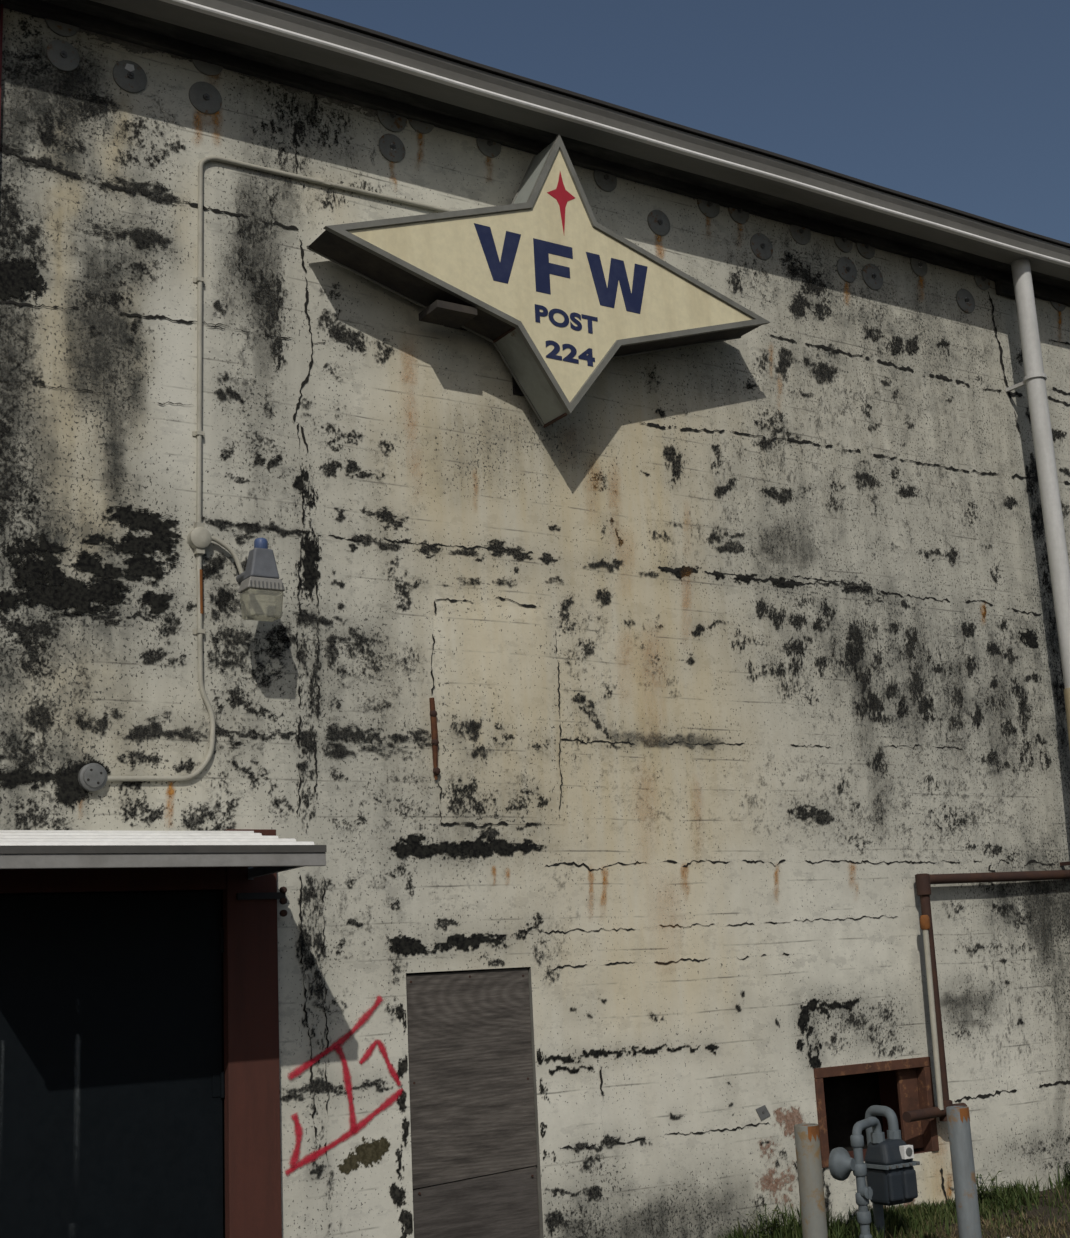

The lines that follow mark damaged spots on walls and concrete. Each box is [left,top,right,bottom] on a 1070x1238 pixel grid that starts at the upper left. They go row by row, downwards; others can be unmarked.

water stain [0,16,190,269]
water stain [235,88,352,373]
crack [0,106,533,827]
crack [642,292,1070,492]
corrosion [429,697,441,780]
crack [658,566,1041,618]
water stain [732,453,1066,853]
water stain [280,876,393,1109]
mould [437,918,458,931]
crack [545,915,898,934]
crack [546,859,1059,872]
flaking render [760,1107,803,1206]